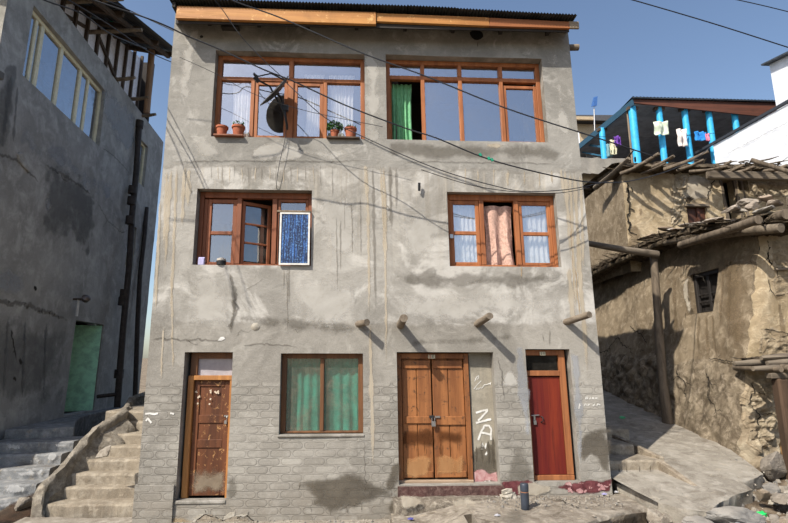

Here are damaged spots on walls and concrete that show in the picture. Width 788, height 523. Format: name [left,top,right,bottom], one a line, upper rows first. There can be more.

leakage [254,144,303,160]
leakage [322,201,354,251]
crack [627,183,637,235]
flaking render [670,173,710,225]
flaking render [758,327,788,355]
crack [748,383,777,433]
leakage [299,464,398,515]